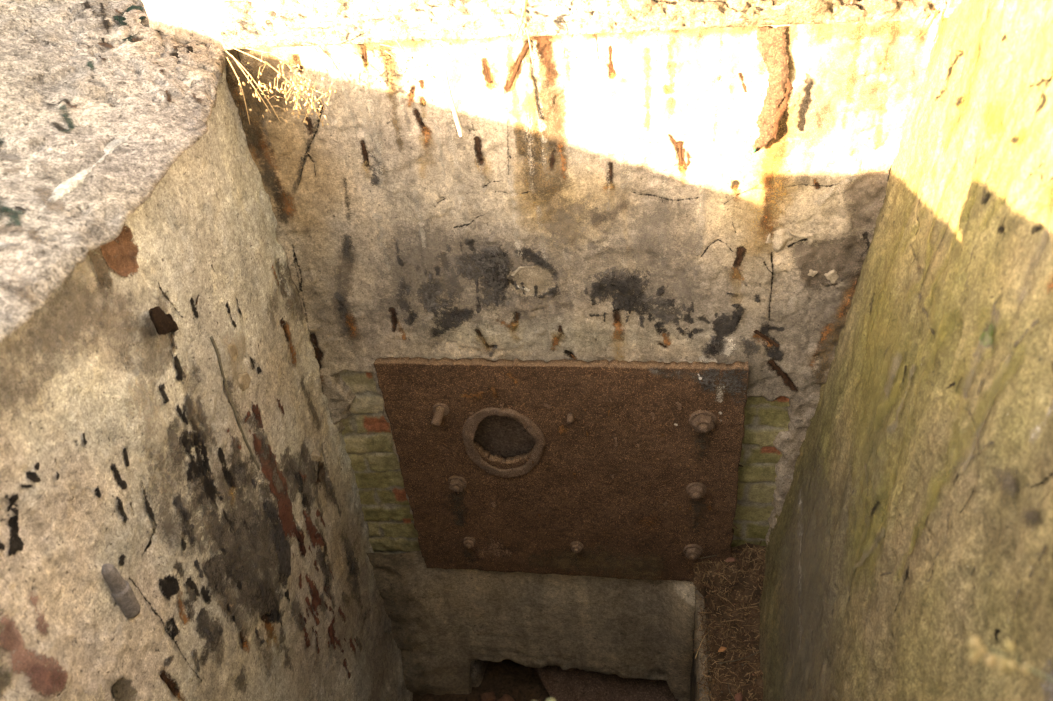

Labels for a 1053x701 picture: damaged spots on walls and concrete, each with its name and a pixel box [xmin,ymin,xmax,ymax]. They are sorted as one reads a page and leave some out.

corrosion [226,47,322,223]
corrosion [518,35,570,198]
corrosion [668,134,690,176]
corrosion [760,112,795,239]
corrosion [280,317,296,366]
water stain [395,239,560,337]
water stain [584,267,760,363]
crack [764,252,774,320]
water stain [0,268,291,578]
water stain [159,574,190,640]
water stain [201,585,212,604]
corrosion [261,613,276,640]